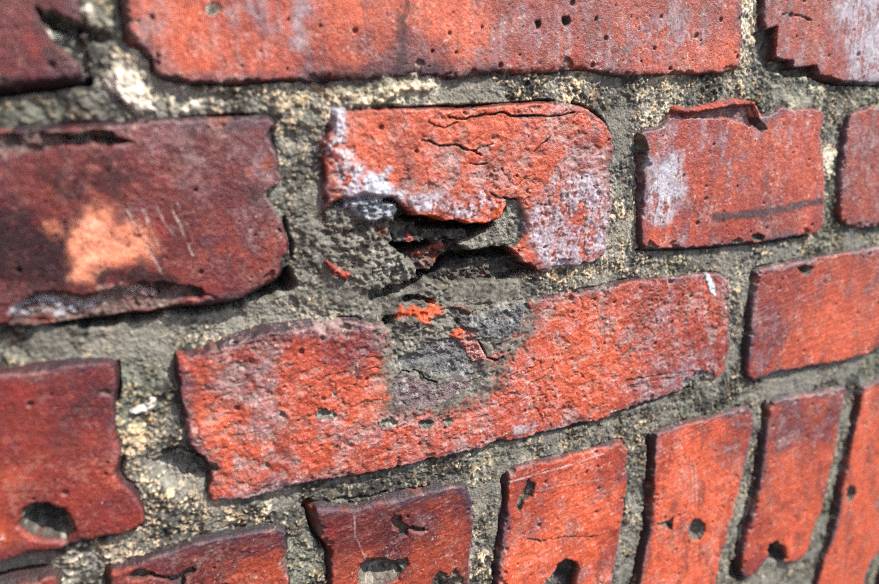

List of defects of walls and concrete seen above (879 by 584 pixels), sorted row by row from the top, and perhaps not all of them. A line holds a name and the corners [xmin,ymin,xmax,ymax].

water stain [327,110,503,218]
crack [421,112,565,151]
efflorescence [524,173,610,266]
spalling [10,282,204,324]
spalling [299,195,538,429]